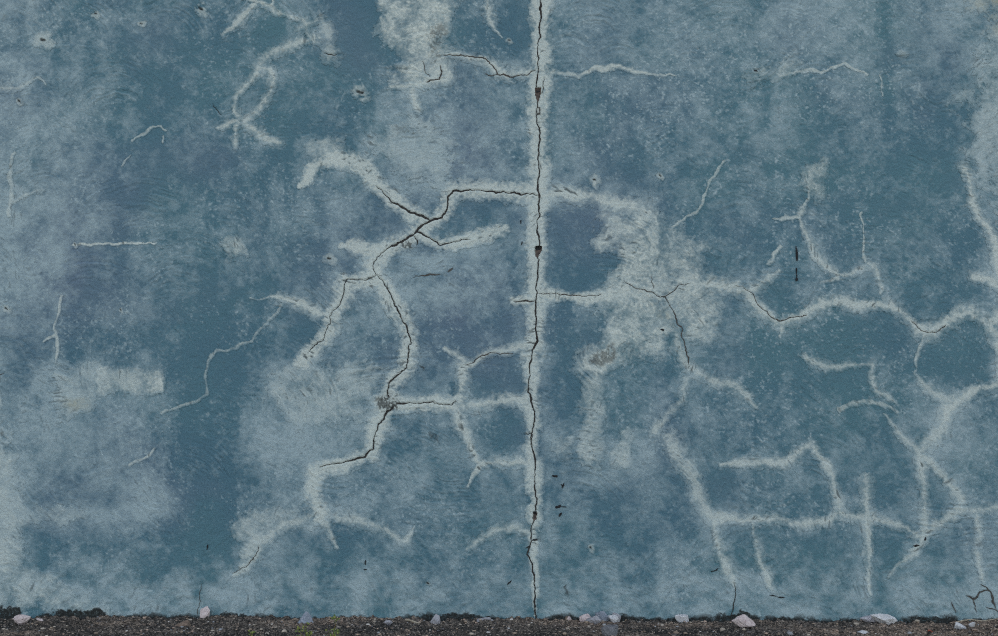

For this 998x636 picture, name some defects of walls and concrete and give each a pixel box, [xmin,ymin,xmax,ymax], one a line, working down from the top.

damp [131,125,168,144]
damp [160,0,727,621]
crack [309,0,601,618]
crack [627,276,689,364]
crack [744,288,806,321]
damp [648,15,998,598]
damp [0,392,277,620]
damp [619,608,858,623]
damp [896,612,996,624]